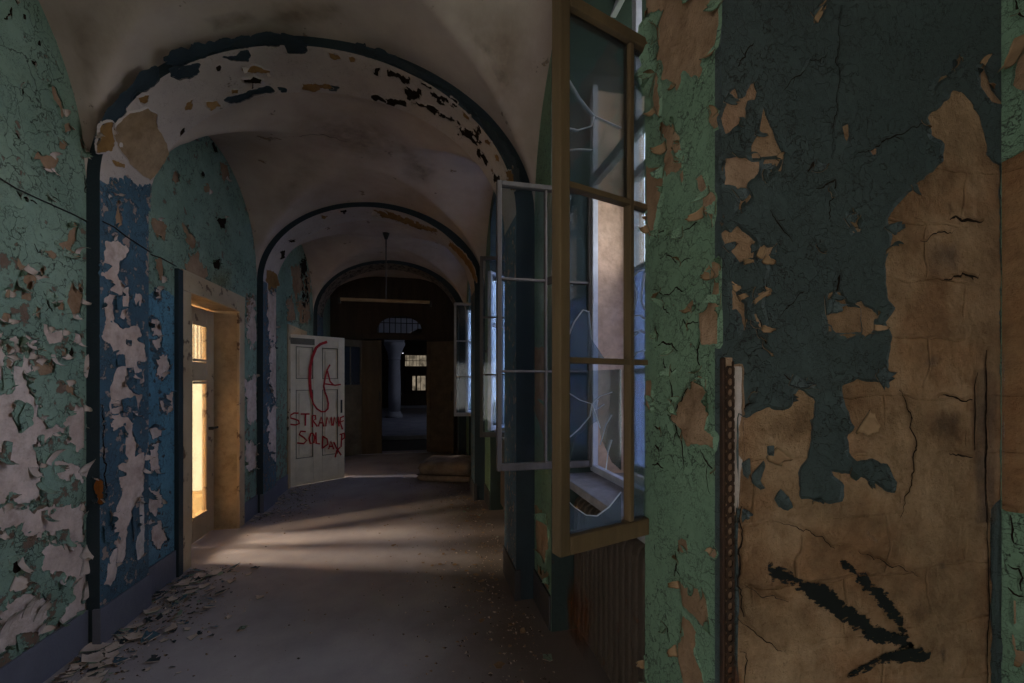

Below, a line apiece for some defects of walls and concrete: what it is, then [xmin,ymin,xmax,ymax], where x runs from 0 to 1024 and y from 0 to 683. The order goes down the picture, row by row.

peeling [369,66,516,192]
peeling [636,0,723,238]
peeling [679,81,785,349]
crack [920,213,984,242]
crack [944,270,980,281]
peeling [0,84,181,659]
peeling [643,379,655,414]
flaking render [670,371,719,452]
flaking render [731,90,1024,683]
crack [899,388,919,518]
peeling [666,577,710,683]